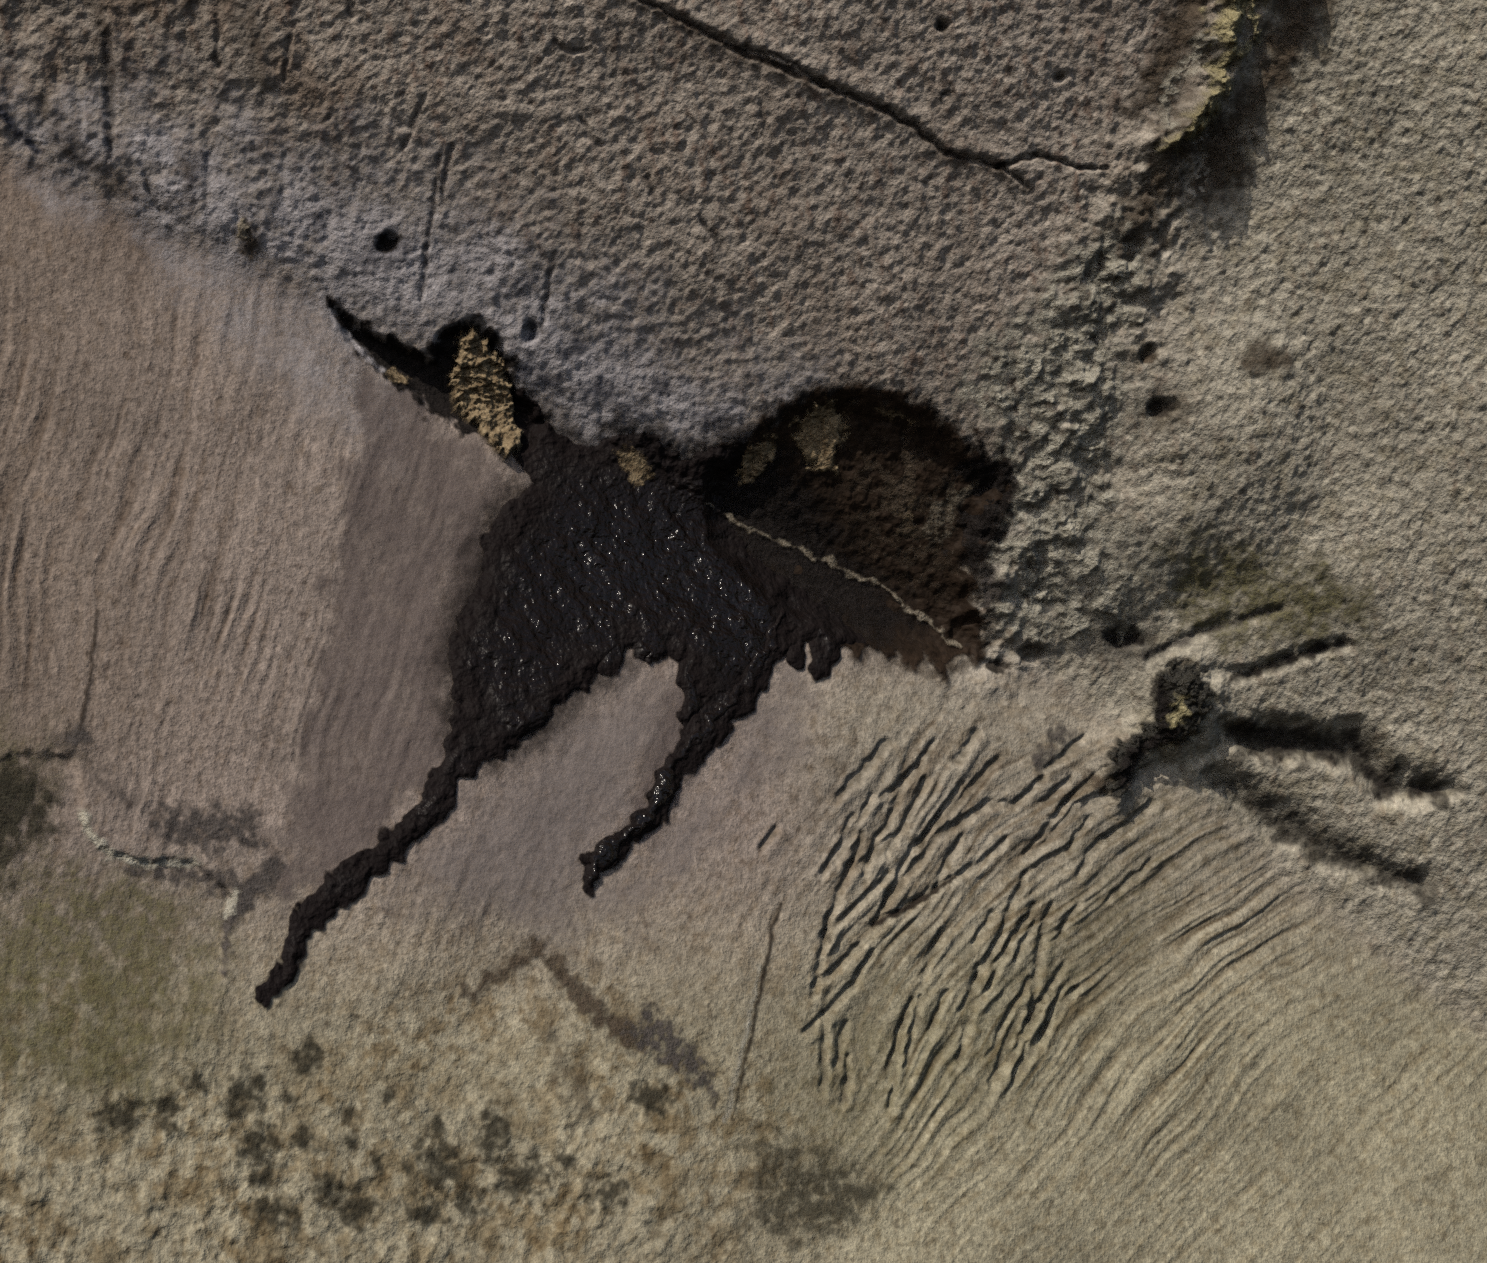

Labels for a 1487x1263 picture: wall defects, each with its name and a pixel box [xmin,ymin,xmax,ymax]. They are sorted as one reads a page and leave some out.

crack [639,0,1103,185]
water stain [1161,0,1262,150]
spalling [325,295,528,457]
spalling [528,320,538,341]
water stain [0,98,868,1008]
spalling [709,382,1020,681]
crack [723,902,782,1121]